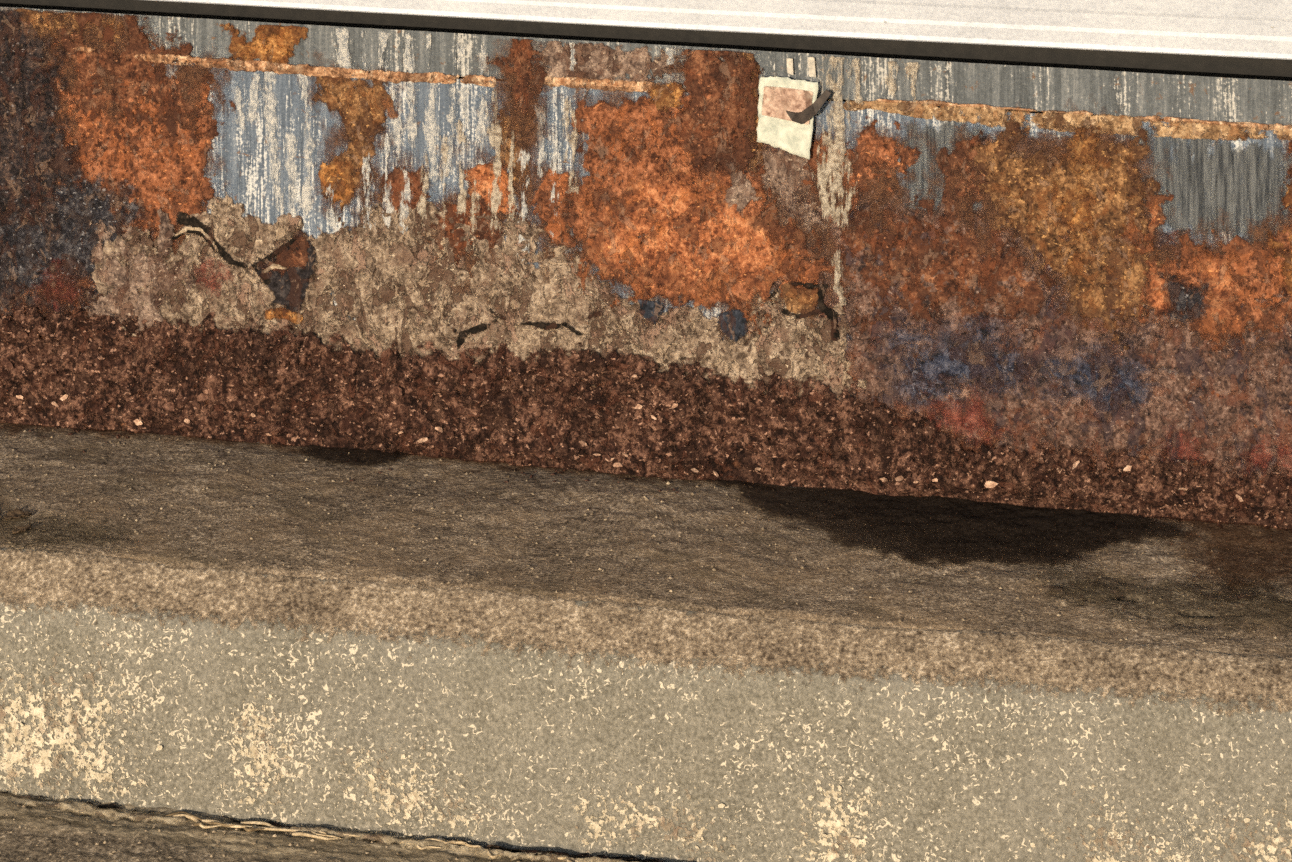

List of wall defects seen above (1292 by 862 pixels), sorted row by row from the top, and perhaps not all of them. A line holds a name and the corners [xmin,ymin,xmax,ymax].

rust [13,8,308,255]
crack [171,211,297,285]
rust [312,39,1292,393]
rust [0,267,122,352]
spalling [84,190,867,402]
crack [442,309,603,349]
peeling [626,397,678,420]